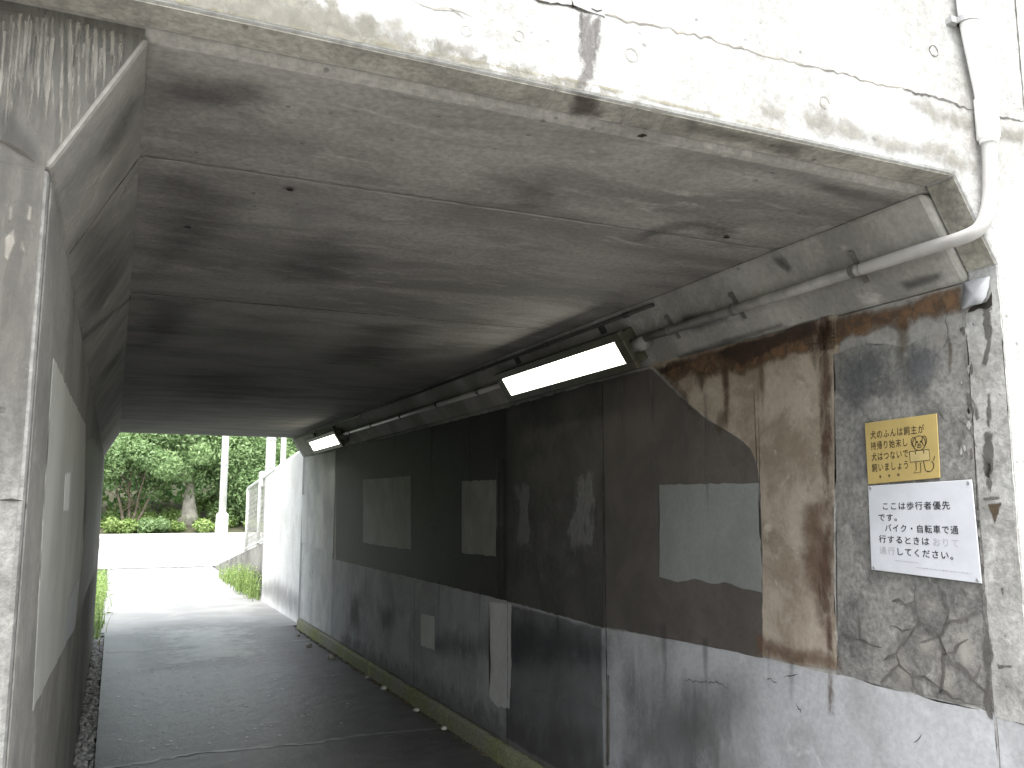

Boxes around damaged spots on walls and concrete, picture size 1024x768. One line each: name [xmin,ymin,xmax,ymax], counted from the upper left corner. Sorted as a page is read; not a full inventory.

damp [0,13,122,138]
crack [414,0,473,19]
damp [573,12,601,114]
crack [536,0,973,110]
rust [660,287,961,483]
rust [757,501,835,666]
crack [842,583,987,706]